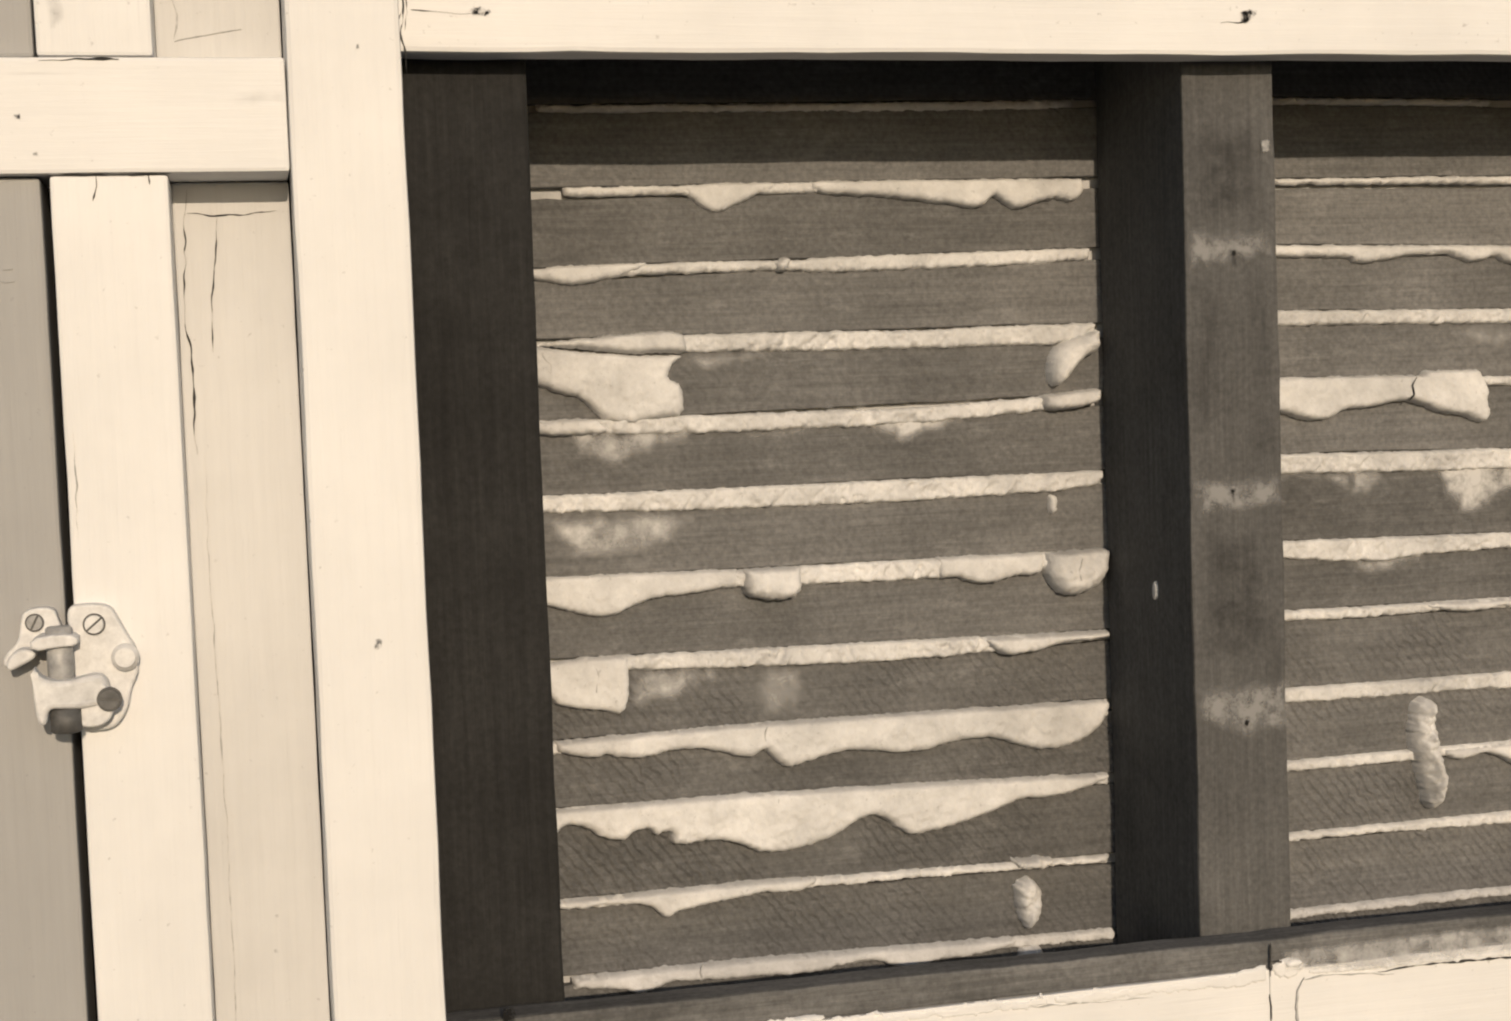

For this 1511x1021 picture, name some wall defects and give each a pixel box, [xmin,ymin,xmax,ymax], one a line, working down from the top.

crack [58,172,271,1019]
crack [1269,943,1511,1021]